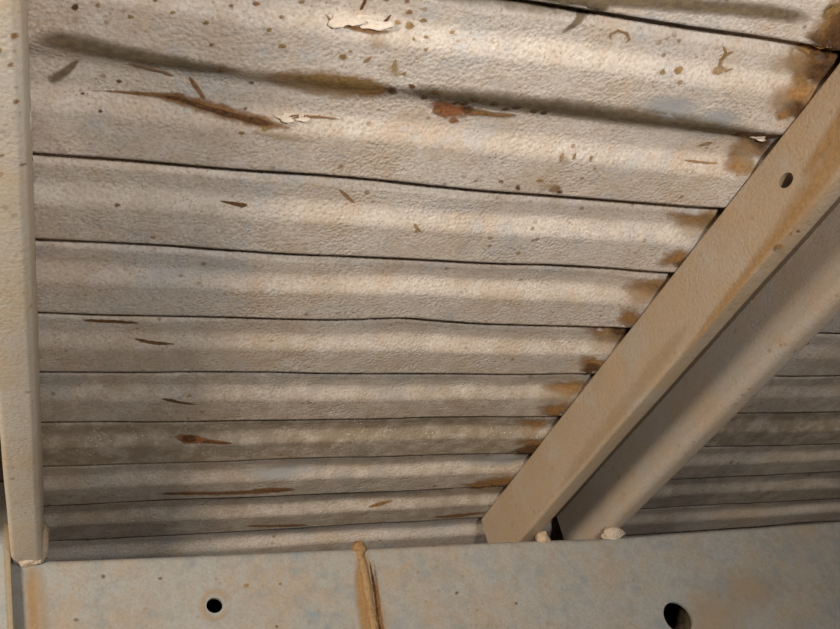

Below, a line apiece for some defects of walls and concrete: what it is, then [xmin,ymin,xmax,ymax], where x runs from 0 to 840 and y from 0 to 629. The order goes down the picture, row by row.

peeling [326,0,397,35]
corrosion [777,2,840,120]
corrosion [433,101,516,123]
corrosion [703,116,840,330]
corrosion [594,311,639,341]
corrosion [583,357,605,374]
corrosion [524,383,581,429]
corrosion [175,435,231,444]
corrosion [515,440,542,454]
corrosion [358,572,383,629]